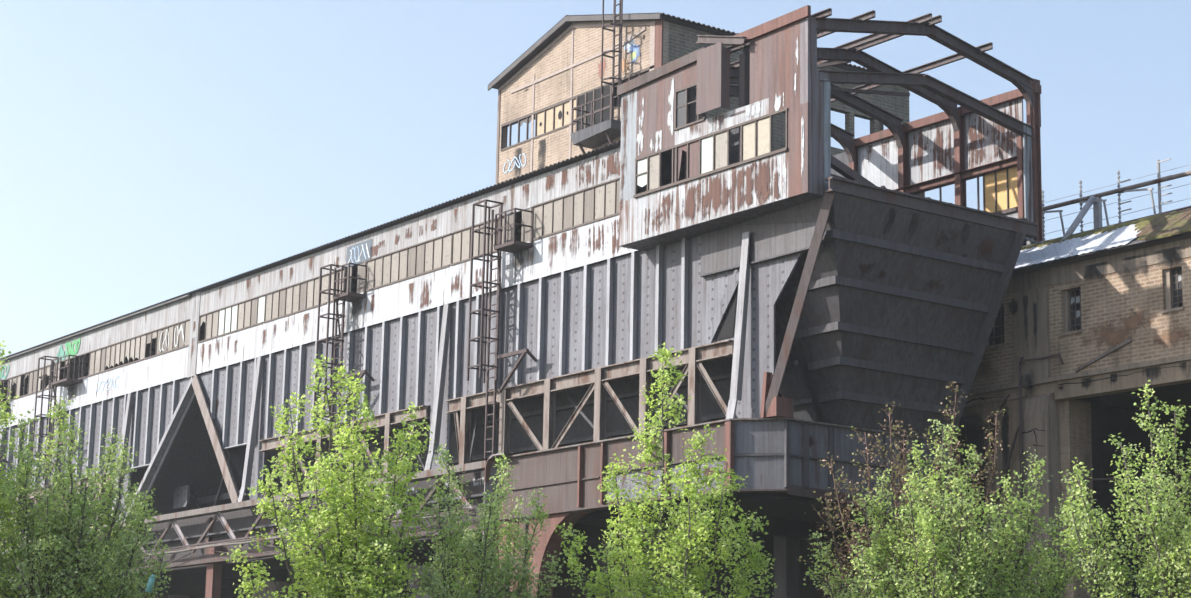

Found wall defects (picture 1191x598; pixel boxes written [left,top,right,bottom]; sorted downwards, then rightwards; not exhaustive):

corrosion [548,229,579,266]
corrosion [191,322,237,362]